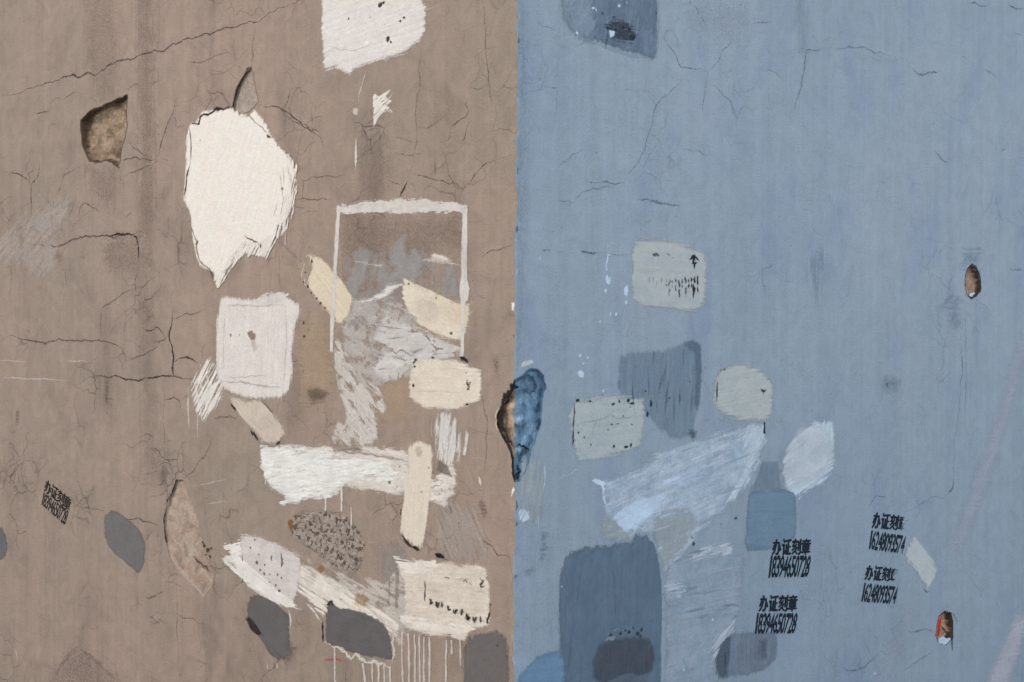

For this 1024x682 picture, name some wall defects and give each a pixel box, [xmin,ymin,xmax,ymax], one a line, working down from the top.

flaking render [80,94,128,167]
crack [7,0,323,279]
flaking render [232,66,259,115]
crack [392,0,508,198]
crack [563,36,733,202]
flaking render [965,264,982,299]
crack [10,289,235,524]
spalling [495,368,546,482]
flaking render [935,611,957,650]